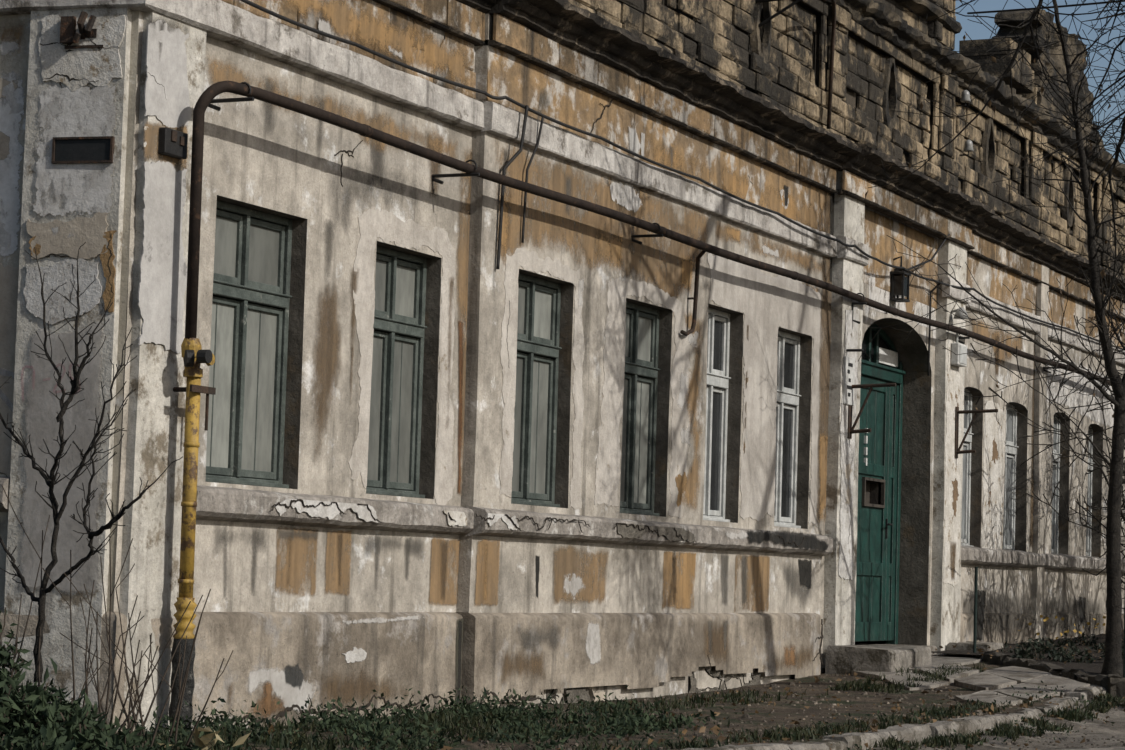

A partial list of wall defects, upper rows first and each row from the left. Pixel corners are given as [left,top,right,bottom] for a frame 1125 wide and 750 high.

leakage [629,127,645,156]
peeling [498,145,823,297]
leakage [825,192,835,236]
leakage [210,61,472,493]
peeling [0,14,126,592]
leakage [806,255,832,521]
peeling [554,546,608,603]
spalling [341,647,367,663]
leakage [502,630,557,680]
leakage [586,622,601,664]
leakage [704,622,727,660]
leakage [764,646,812,668]